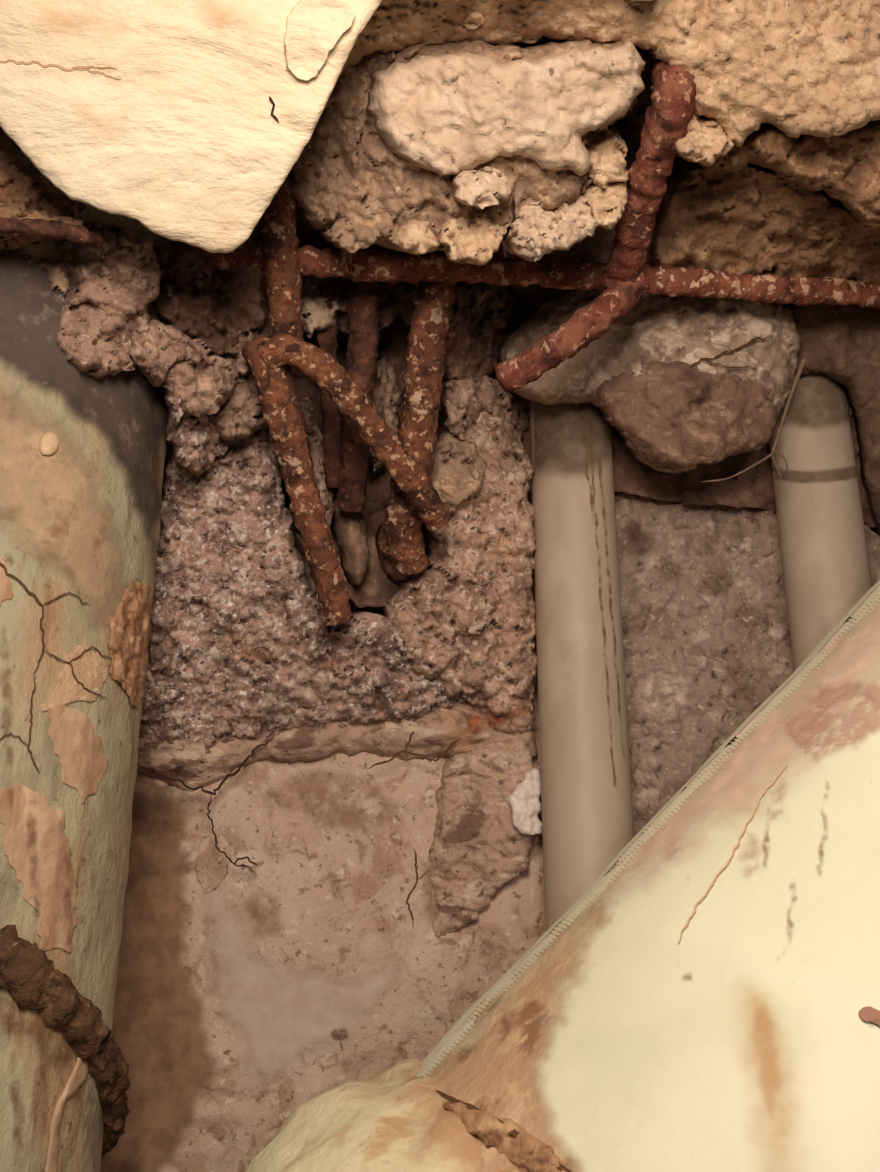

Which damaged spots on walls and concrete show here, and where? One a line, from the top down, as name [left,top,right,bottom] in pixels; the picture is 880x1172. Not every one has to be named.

spalling [0,0,880,937]
crack [0,562,111,773]
crack [137,733,280,873]
crack [367,731,461,769]
crack [406,849,429,928]
corrosion [426,900,604,1172]